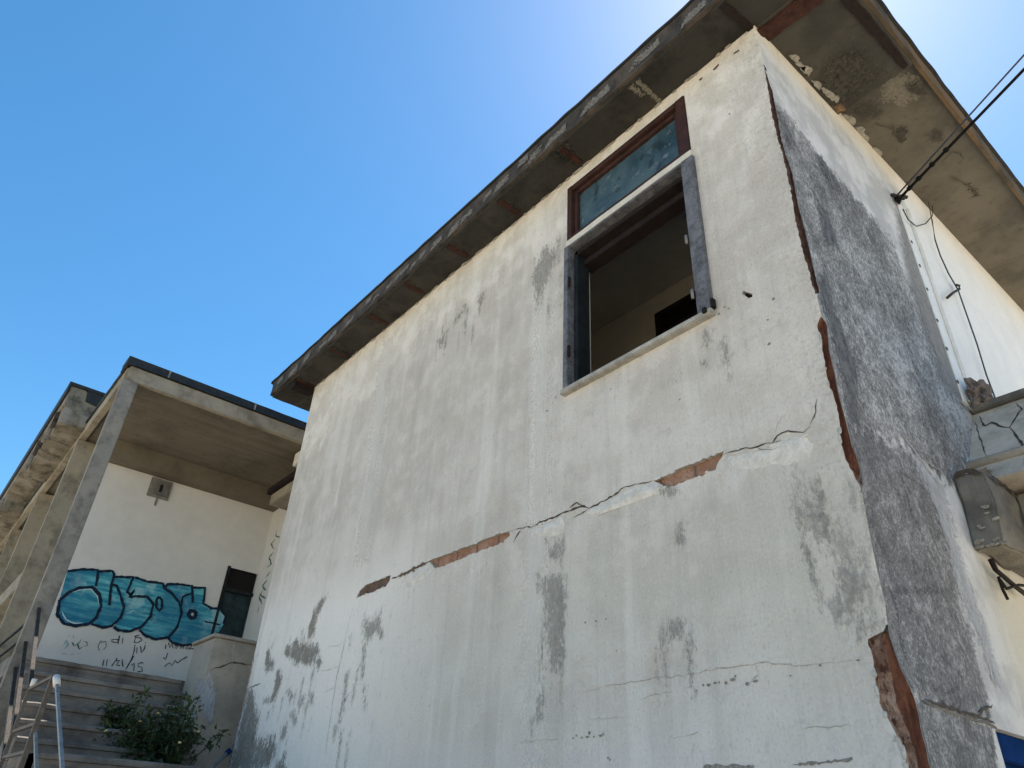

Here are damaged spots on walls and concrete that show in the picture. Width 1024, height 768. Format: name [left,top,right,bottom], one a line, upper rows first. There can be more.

spalling [789,54,882,157]
damp [775,103,1003,768]
crack [903,403,1024,497]
damp [523,247,566,768]
crack [514,481,651,540]
crack [392,561,430,579]
damp [231,596,326,768]
damp [361,615,383,674]
crack [584,636,850,720]
spalling [868,631,930,768]